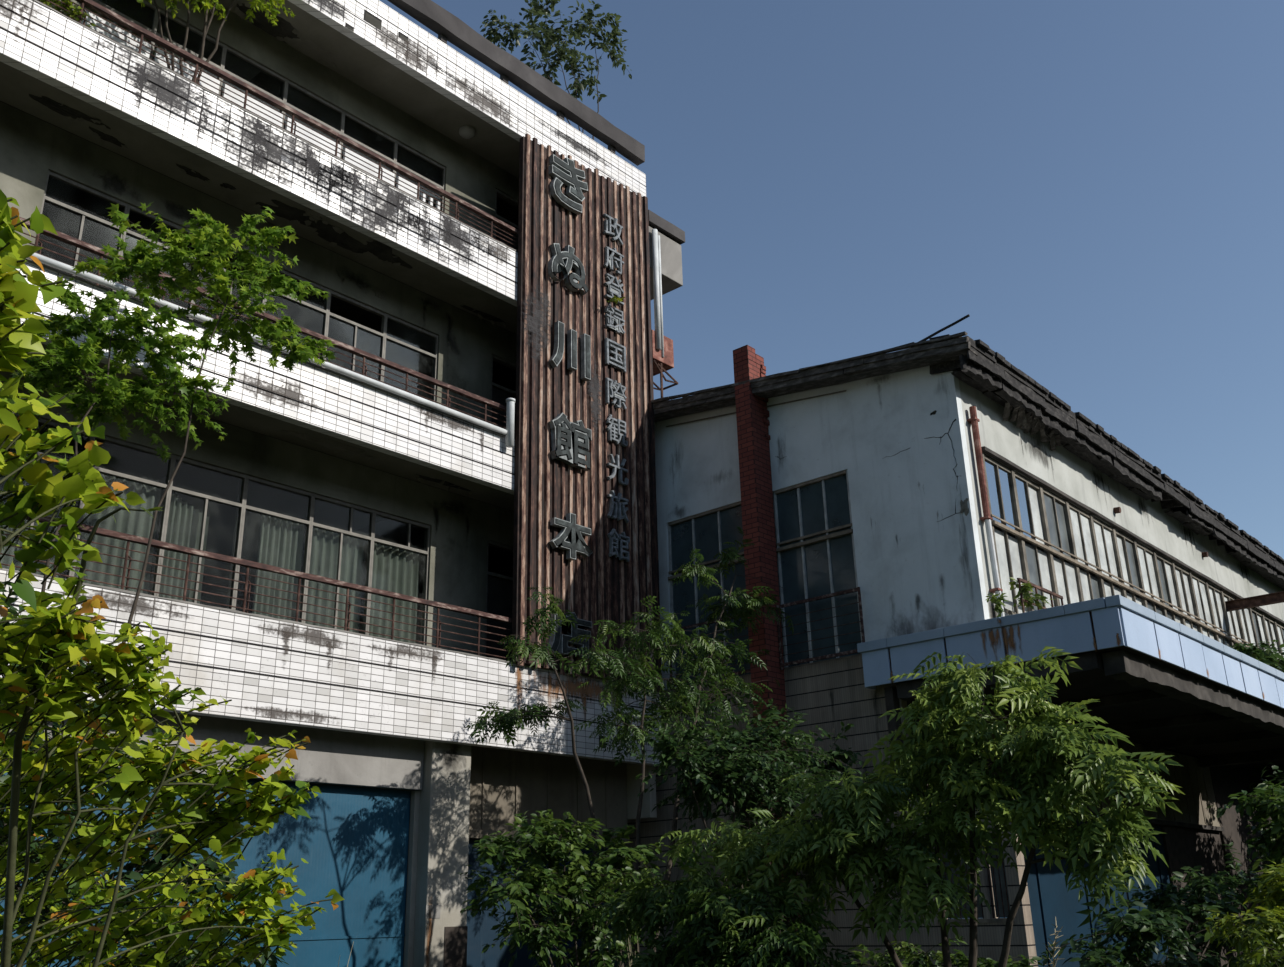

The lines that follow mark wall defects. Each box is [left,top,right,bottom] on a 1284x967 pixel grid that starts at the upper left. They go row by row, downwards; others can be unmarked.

leakage [373,27,523,130]
leakage [89,38,511,265]
crack [888,419,960,522]
leakage [282,631,290,668]
corrosion [516,667,619,726]
corrosion [981,620,1021,660]